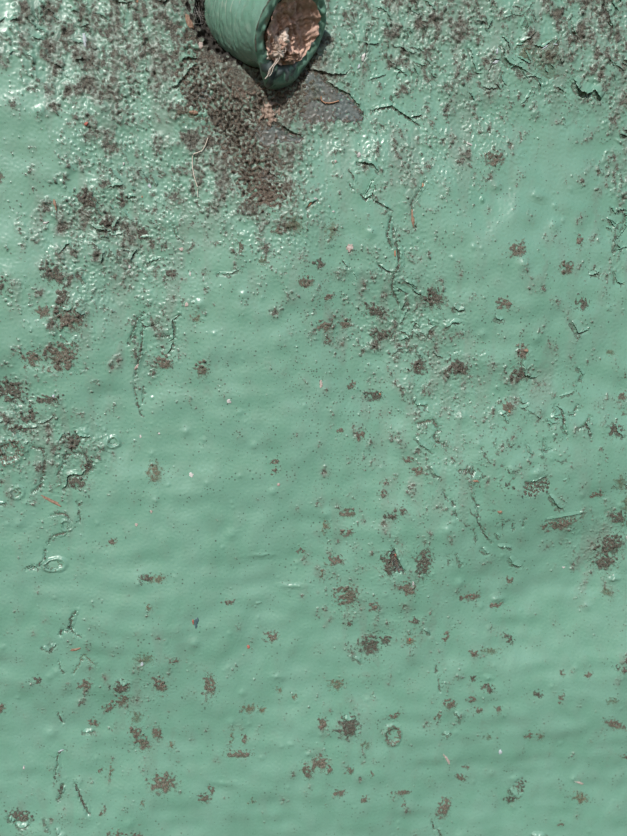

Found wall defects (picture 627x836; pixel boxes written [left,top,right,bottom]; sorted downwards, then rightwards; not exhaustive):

peeling [0,1,64,70]
peeling [370,0,437,80]
peeling [467,1,565,105]
crack [371,96,422,126]
peeling [574,75,606,101]
peeling [84,197,137,269]
peeling [392,279,465,359]
crack [127,311,181,417]
peeling [0,416,53,444]
peeling [61,468,86,488]
peeling [500,476,585,522]